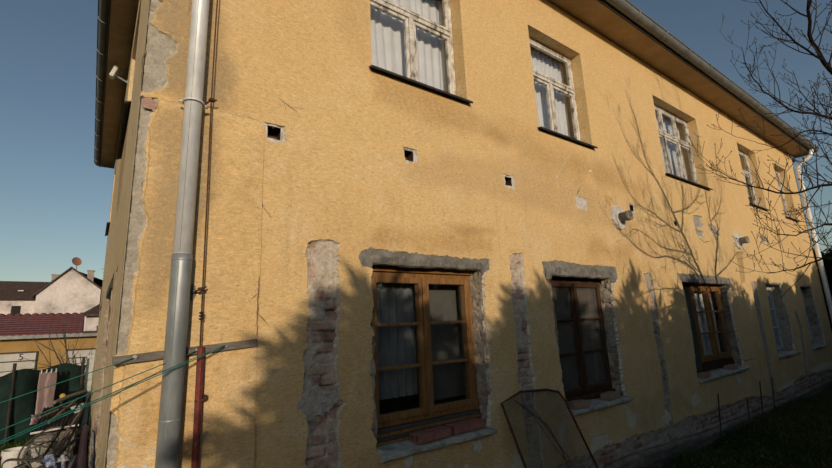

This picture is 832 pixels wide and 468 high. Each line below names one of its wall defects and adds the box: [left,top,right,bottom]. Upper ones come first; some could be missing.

spalling [115,0,179,355]
flaking render [296,239,346,468]
spalling [358,246,492,427]
flaking render [509,253,832,468]